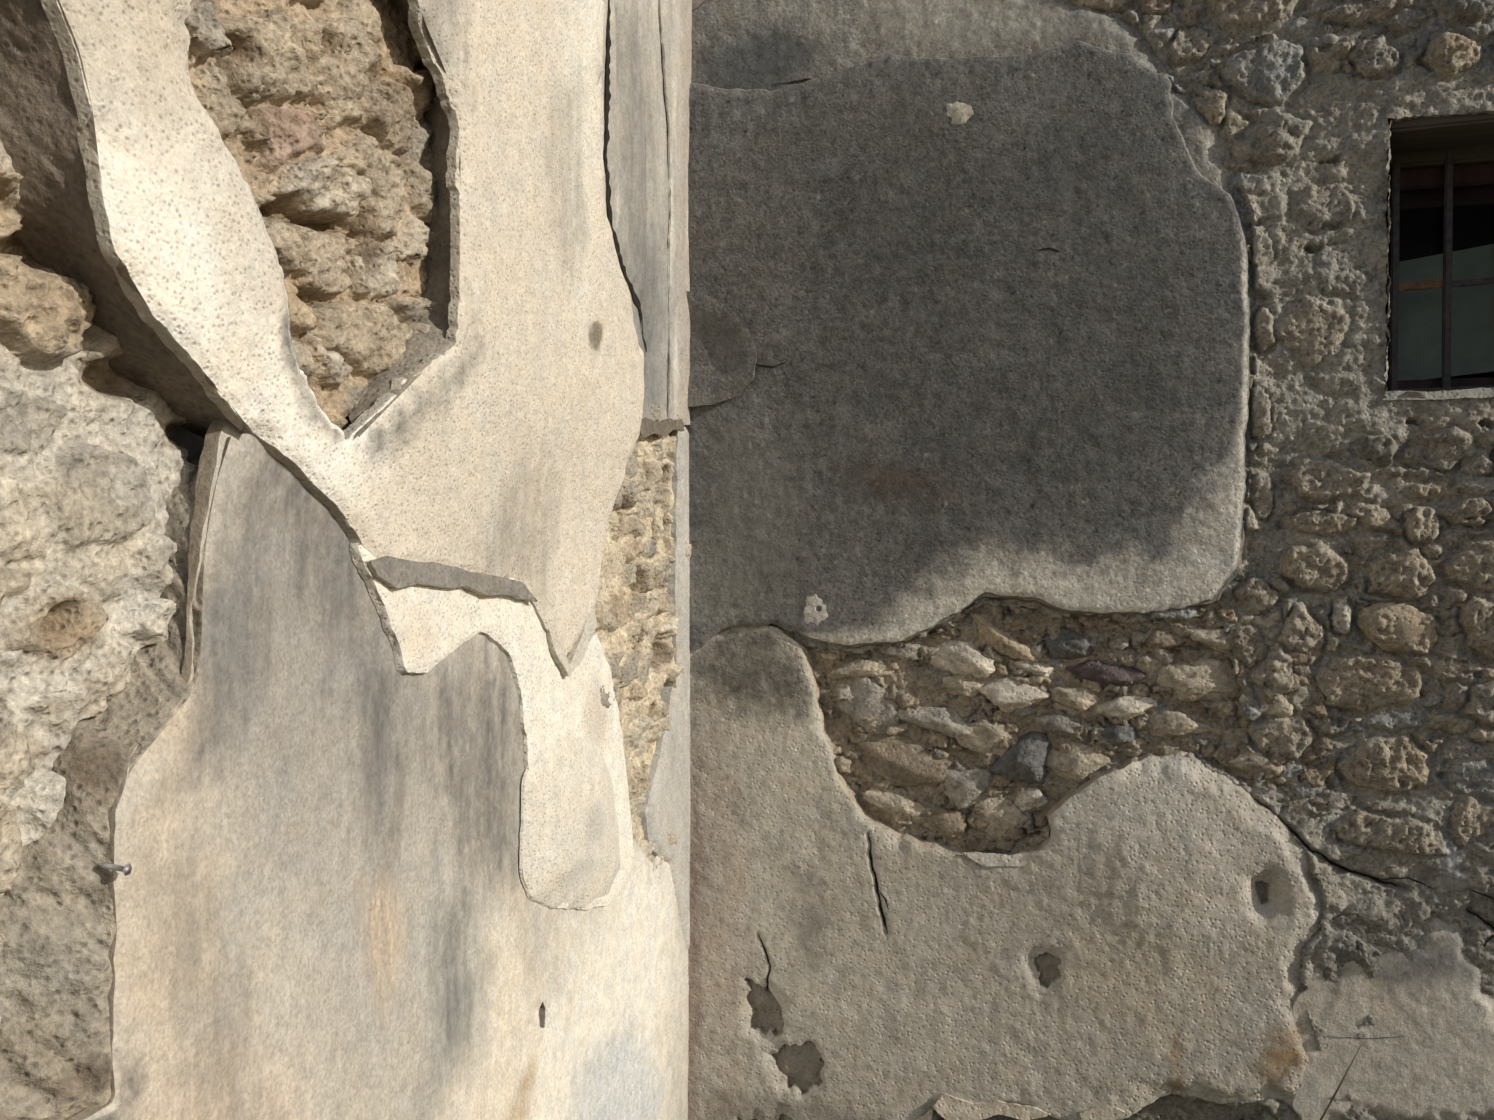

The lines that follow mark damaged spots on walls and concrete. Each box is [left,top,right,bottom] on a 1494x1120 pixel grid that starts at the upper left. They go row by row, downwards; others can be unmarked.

water stain [863,0,1063,46]
spalling [184,0,461,440]
spalling [0,0,251,1119]
water stain [440,684,507,867]
spalling [808,595,1336,867]
crack [758,934,771,991]
crack [868,834,889,934]
crack [1285,824,1433,889]
crack [1467,889,1494,947]
spalling [746,978,824,1092]
flaking render [916,1093,1059,1120]
spalling [1080,1088,1277,1120]